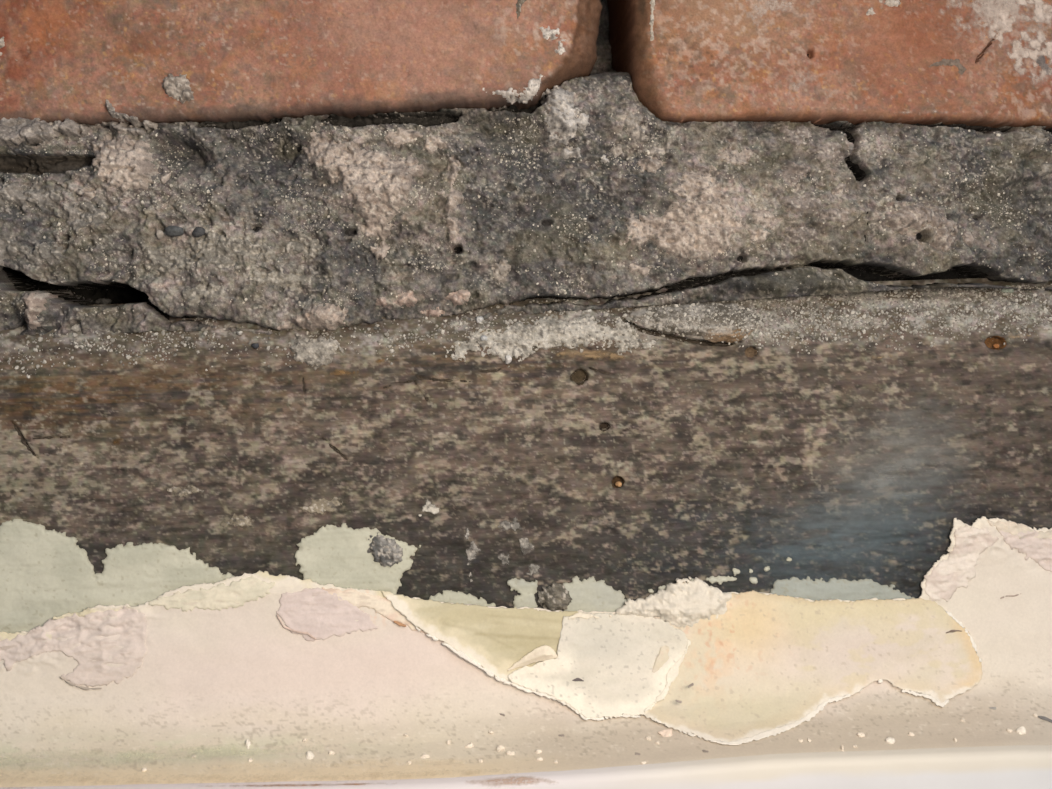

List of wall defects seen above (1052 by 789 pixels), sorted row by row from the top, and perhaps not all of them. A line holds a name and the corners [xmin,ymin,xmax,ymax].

crack [911,123,1012,133]
crack [812,123,866,181]
crack [488,212,1013,347]
crack [147,302,218,321]
peeling [221,513,253,527]
peeling [295,497,421,594]
peeling [0,519,235,633]
peeling [429,563,496,607]
peeling [507,564,540,608]
peeling [563,576,629,612]
peeling [691,566,915,601]